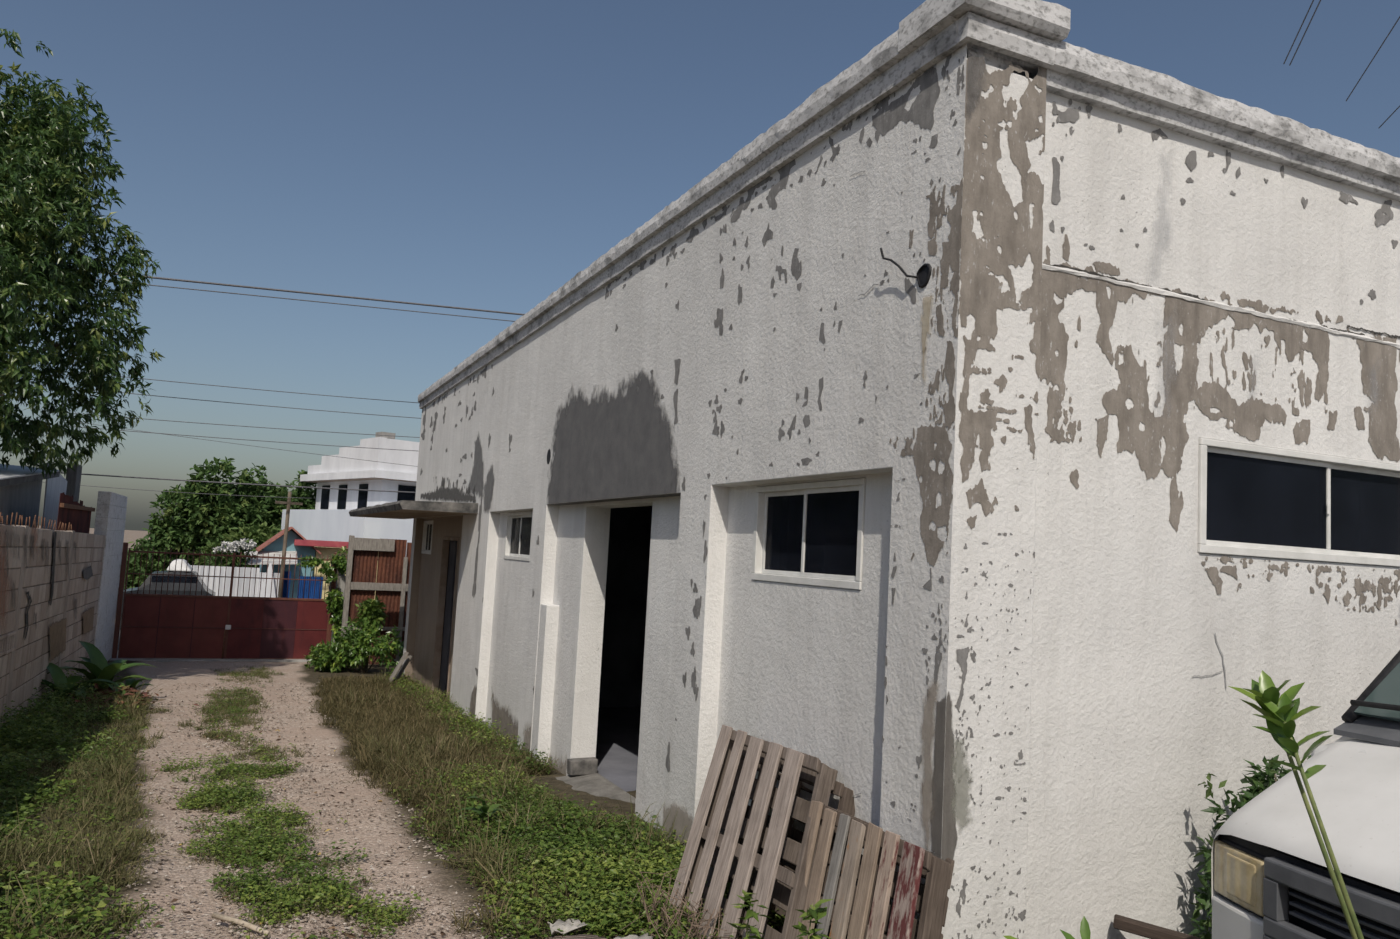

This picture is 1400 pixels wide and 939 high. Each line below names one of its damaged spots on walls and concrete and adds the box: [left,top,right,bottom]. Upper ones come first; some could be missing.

peeling [421,364,494,484]
peeling [472,495,482,598]
peeling [603,54,1400,939]
water stain [922,683,969,860]